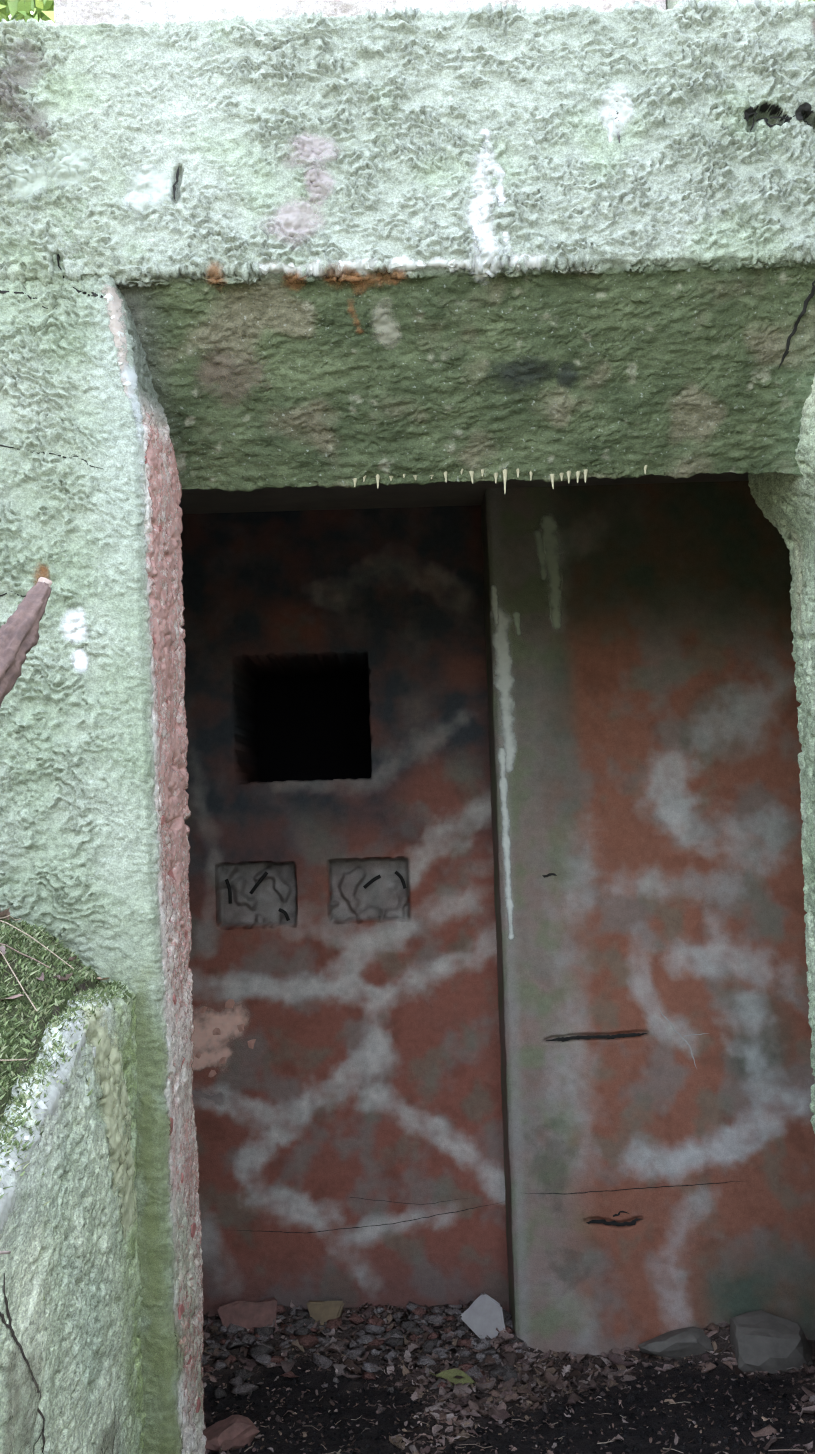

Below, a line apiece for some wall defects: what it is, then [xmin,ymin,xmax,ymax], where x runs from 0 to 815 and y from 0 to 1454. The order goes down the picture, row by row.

spalling [739,102,814,131]
crack [171,167,179,201]
leakage [469,129,509,280]
corrosion [284,273,303,289]
corrosion [324,269,404,289]
crack [778,281,815,369]
corrosion [35,566,49,582]
leakage [534,516,562,629]
leakage [491,585,521,939]
peeling [145,416,256,1413]
crack [546,1033,647,1042]
crack [0,1273,45,1454]